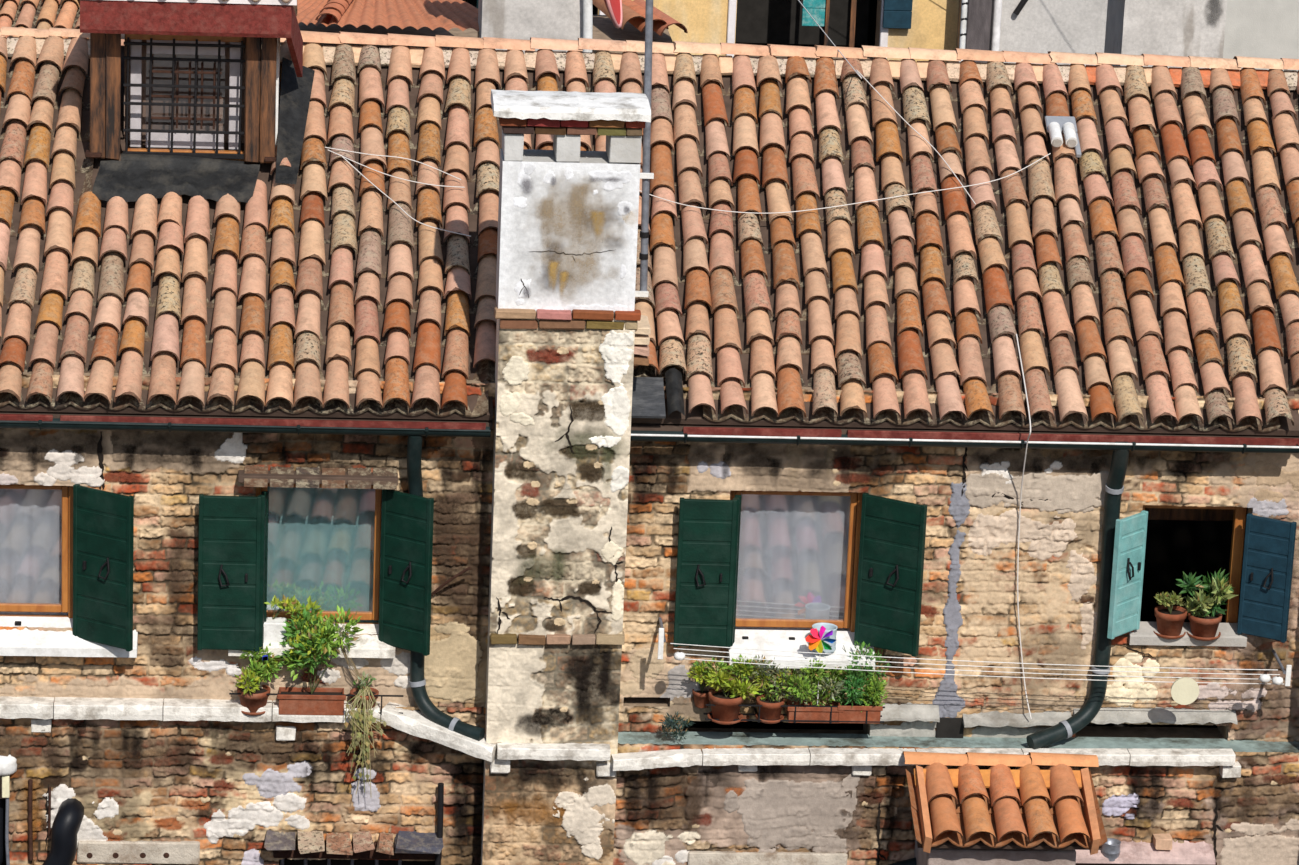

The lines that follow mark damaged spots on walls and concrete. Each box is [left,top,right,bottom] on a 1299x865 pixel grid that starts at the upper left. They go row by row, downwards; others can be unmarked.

damp [539,186,603,283]
flaking render [34,449,137,487]
flaking render [215,432,247,463]
flaking render [499,347,573,427]
spalling [505,460,580,519]
flaking render [563,330,634,492]
spalling [508,577,535,595]
flaking render [578,541,624,621]
flaking render [965,460,1109,650]
peeling [93,797,122,841]
flaking render [155,749,310,844]
flaking render [552,777,616,860]